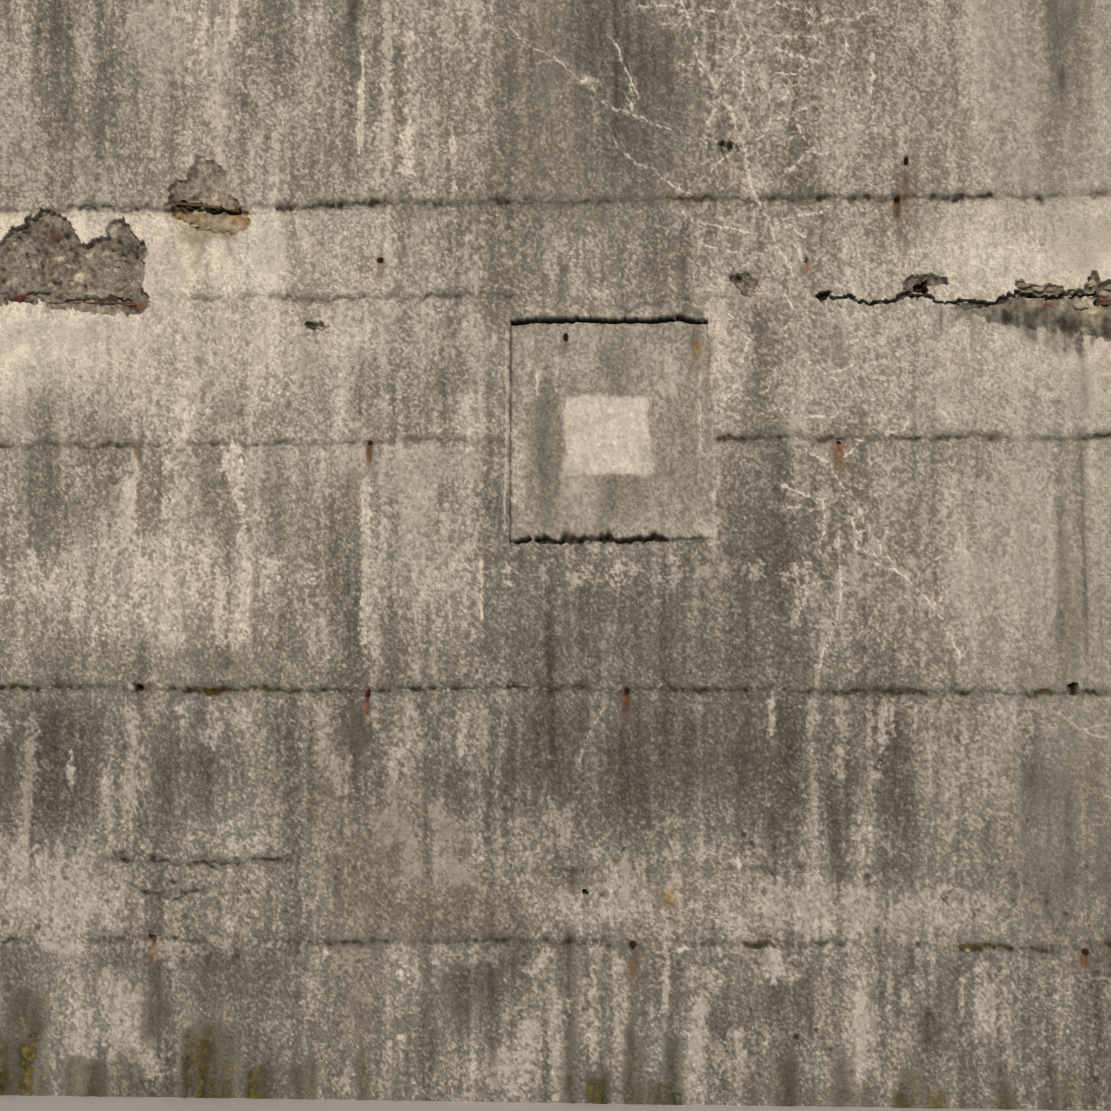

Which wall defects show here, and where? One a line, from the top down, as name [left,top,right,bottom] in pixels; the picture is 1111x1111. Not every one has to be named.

water stain [125,0,239,135]
water stain [356,0,418,197]
crack [509,23,672,130]
spalling [0,200,151,318]
spalling [152,152,252,237]
crack [615,0,962,673]
spalling [815,270,1111,342]
water stain [24,355,284,653]
water stain [341,442,484,644]
water stain [969,447,1067,650]
water stain [101,705,147,840]
water stain [0,834,125,955]